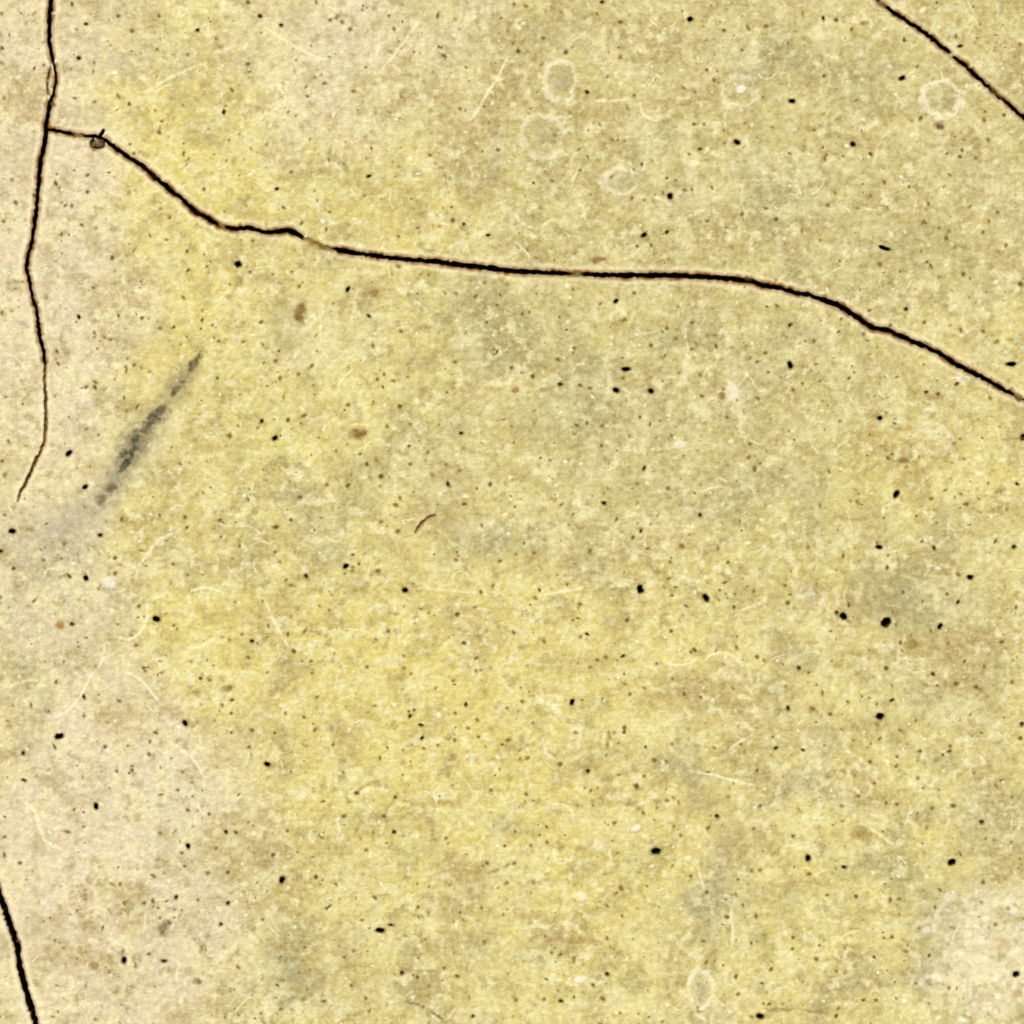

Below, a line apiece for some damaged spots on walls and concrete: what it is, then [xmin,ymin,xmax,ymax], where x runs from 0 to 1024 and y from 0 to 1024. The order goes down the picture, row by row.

crack [17,0,1024,502]
crack [0,886,40,1024]